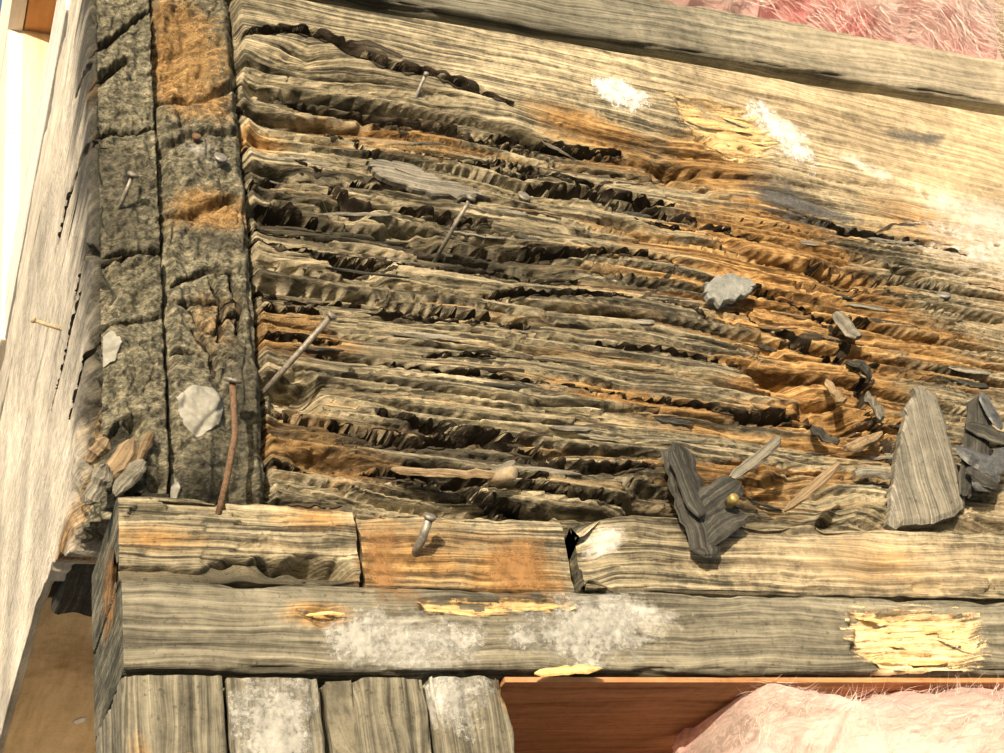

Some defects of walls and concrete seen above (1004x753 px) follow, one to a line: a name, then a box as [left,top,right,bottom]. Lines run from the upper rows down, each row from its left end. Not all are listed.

crack [88,17,142,91]
crack [246,23,515,106]
peeling [687,117,779,144]
crack [803,216,967,256]
crack [18,115,153,461]
crack [171,100,896,465]
crack [253,452,311,474]
crack [325,407,656,521]
crack [284,501,342,509]
peeling [855,617,973,647]